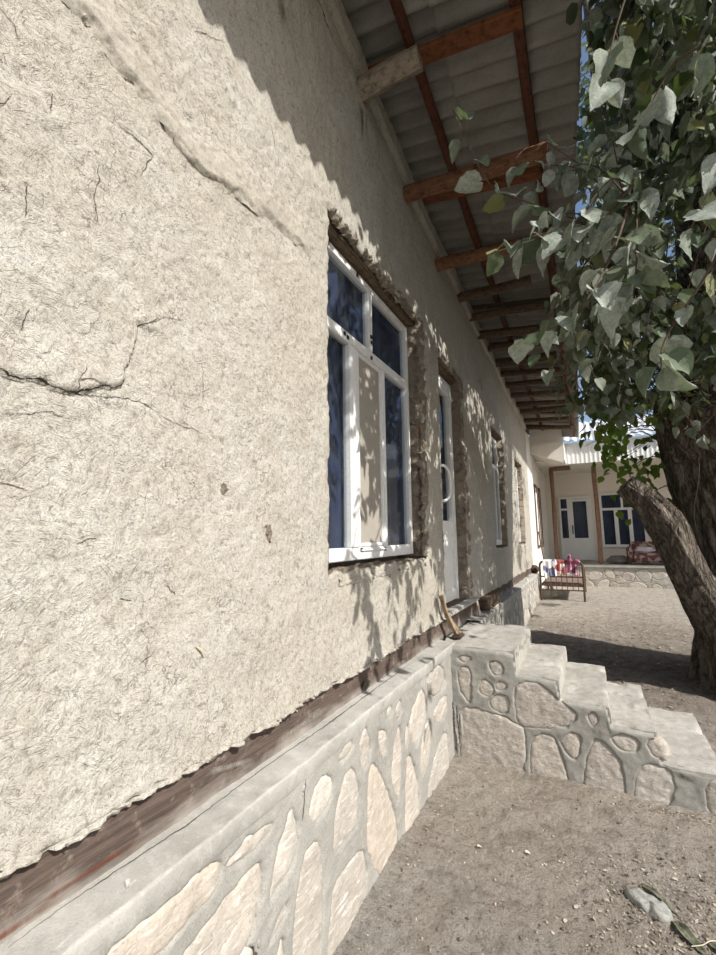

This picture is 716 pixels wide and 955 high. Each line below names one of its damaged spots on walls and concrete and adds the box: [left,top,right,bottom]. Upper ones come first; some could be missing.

crack [0,317,202,433]
crack [250,939,261,955]